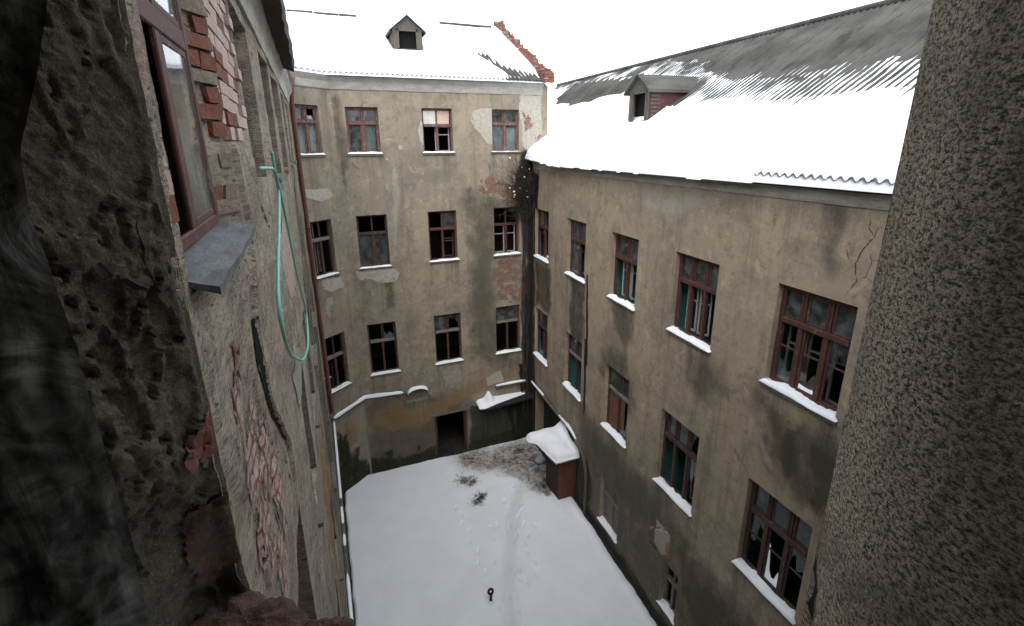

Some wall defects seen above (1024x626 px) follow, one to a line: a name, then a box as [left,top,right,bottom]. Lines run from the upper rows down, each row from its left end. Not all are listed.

flaking render [159,0,248,153]
peeling [470,108,492,144]
peeling [518,95,542,151]
flaking render [193,169,241,215]
peeling [305,188,333,202]
flaking render [491,256,523,303]
crack [843,218,881,298]
water stain [294,151,744,626]
peeling [180,340,355,626]
water stain [767,411,838,512]
peeling [654,520,670,558]